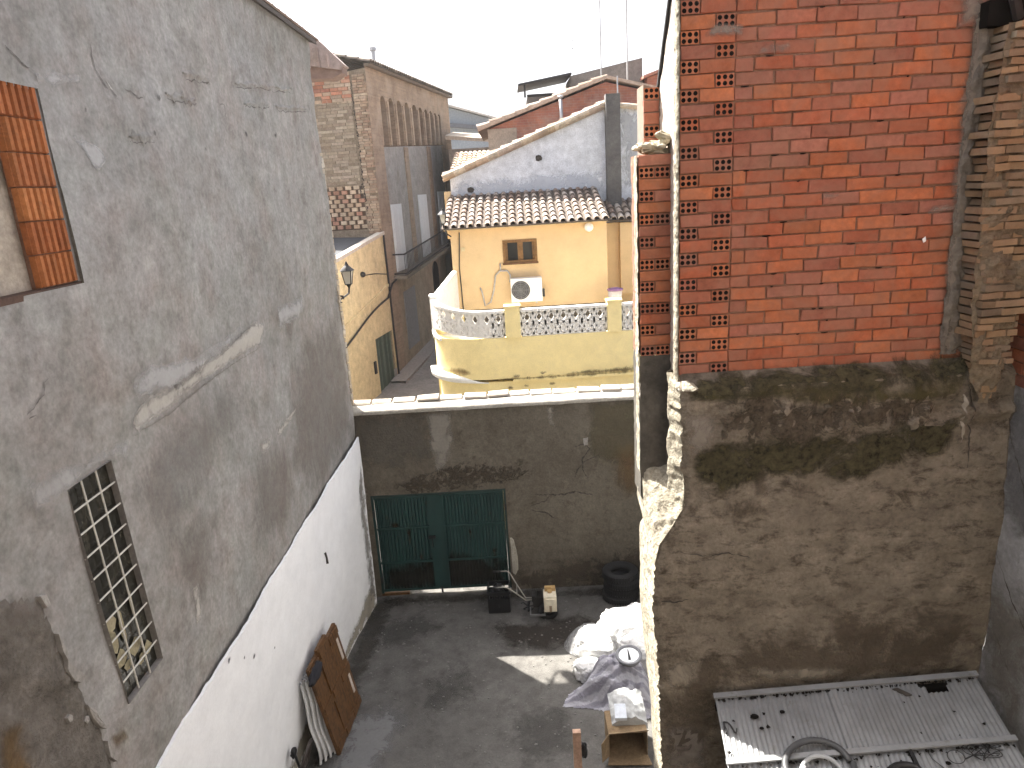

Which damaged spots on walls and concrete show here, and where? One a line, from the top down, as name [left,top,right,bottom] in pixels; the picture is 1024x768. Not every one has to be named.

crack [90,45,143,99]
peeling [134,323,263,436]
leakage [691,354,969,400]
spalling [397,463,528,494]
crack [531,437,604,519]
spalling [666,367,685,510]
leakage [694,420,958,518]
spalling [0,594,118,768]
spalling [639,518,663,768]